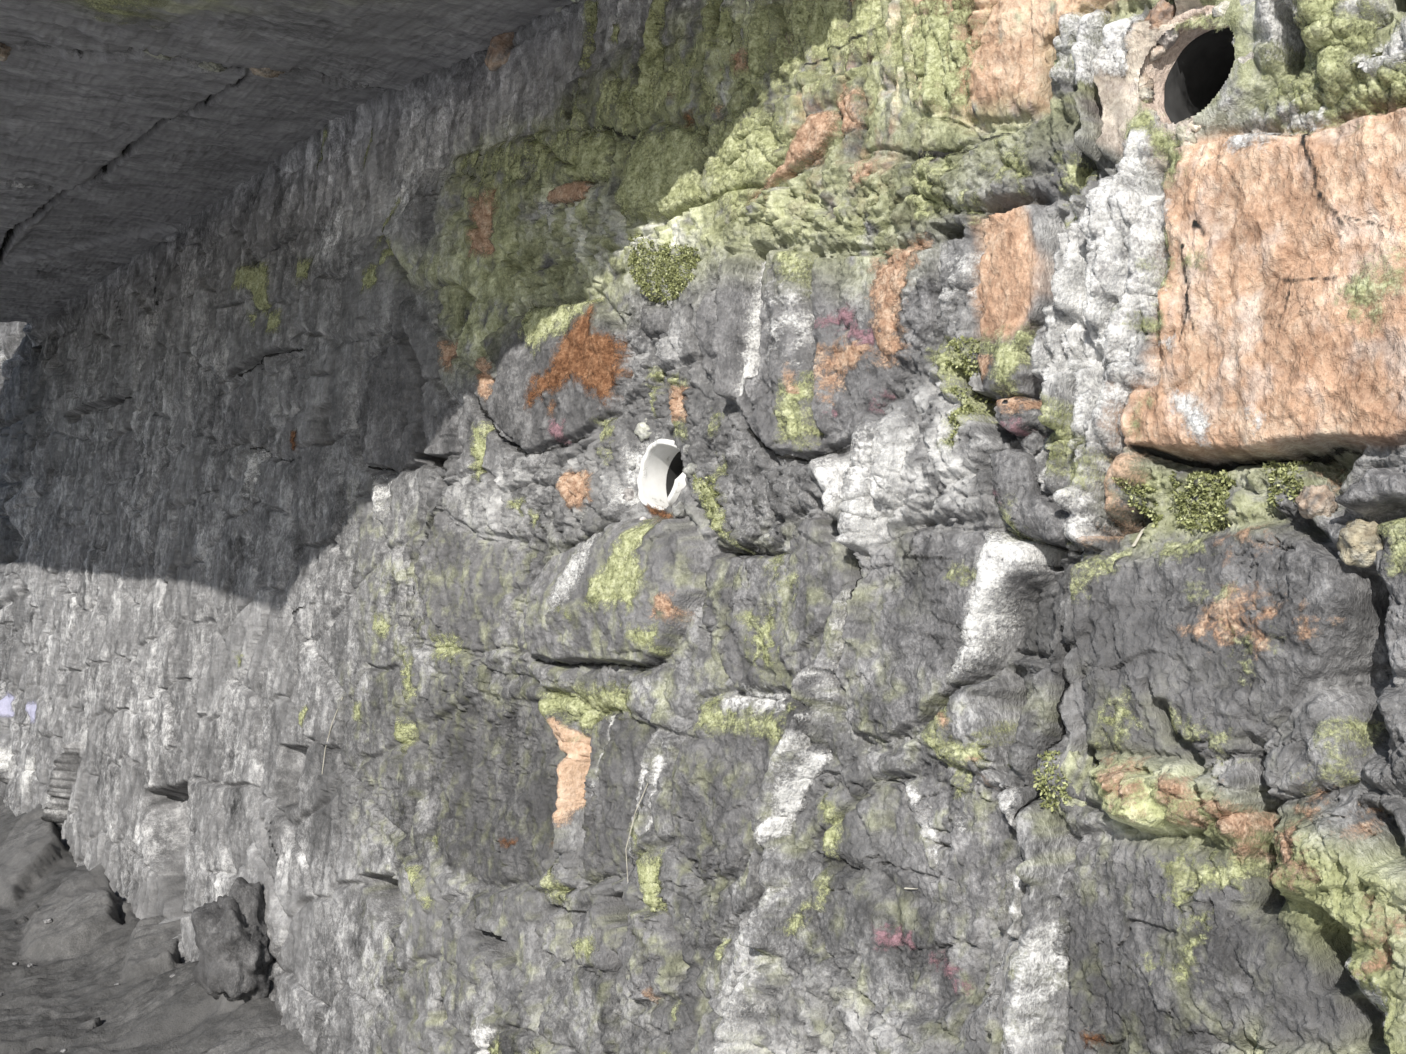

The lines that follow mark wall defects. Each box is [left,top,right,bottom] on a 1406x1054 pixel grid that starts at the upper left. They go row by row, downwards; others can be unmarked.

crack [0,184,44,259]